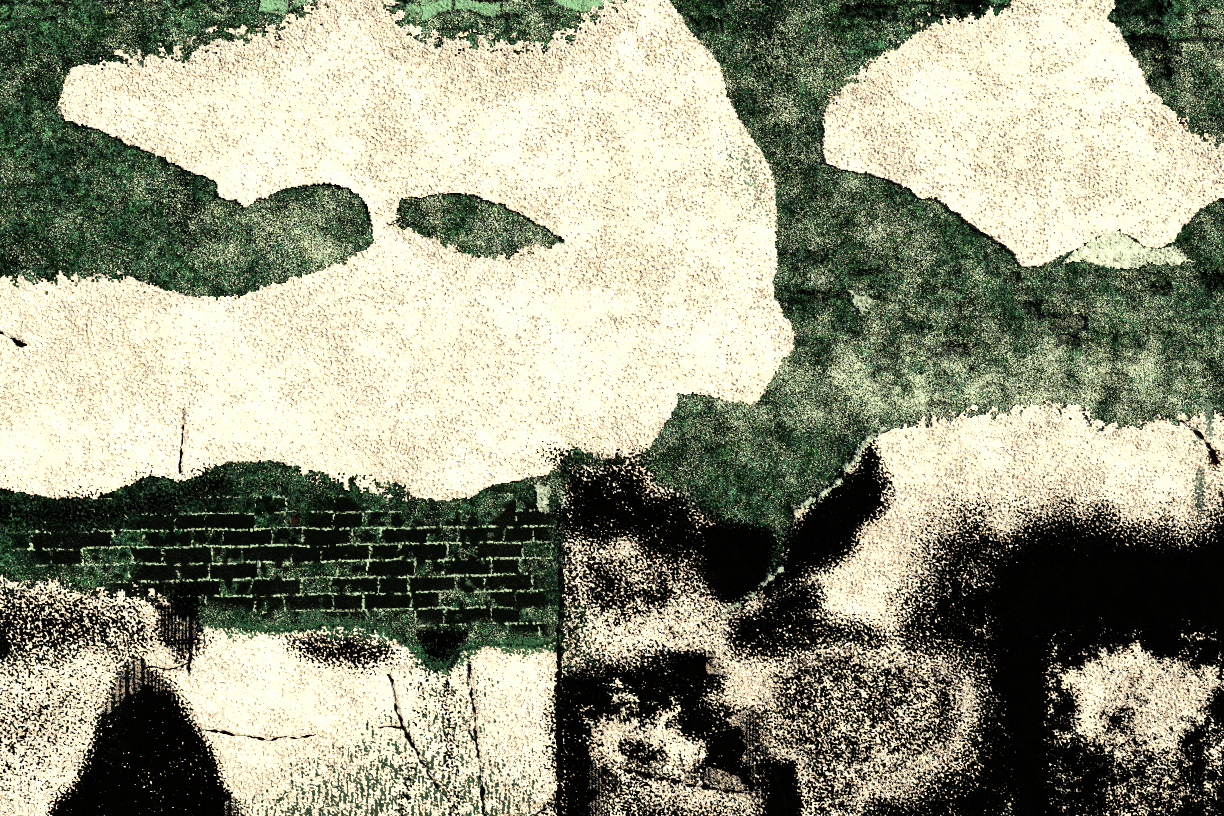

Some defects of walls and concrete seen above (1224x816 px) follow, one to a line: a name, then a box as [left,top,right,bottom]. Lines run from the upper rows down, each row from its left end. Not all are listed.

peeling [381,0,627,55]
peeling [0,0,563,301]
crack [0,331,27,347]
peeling [561,0,1224,586]
peeling [0,460,575,683]